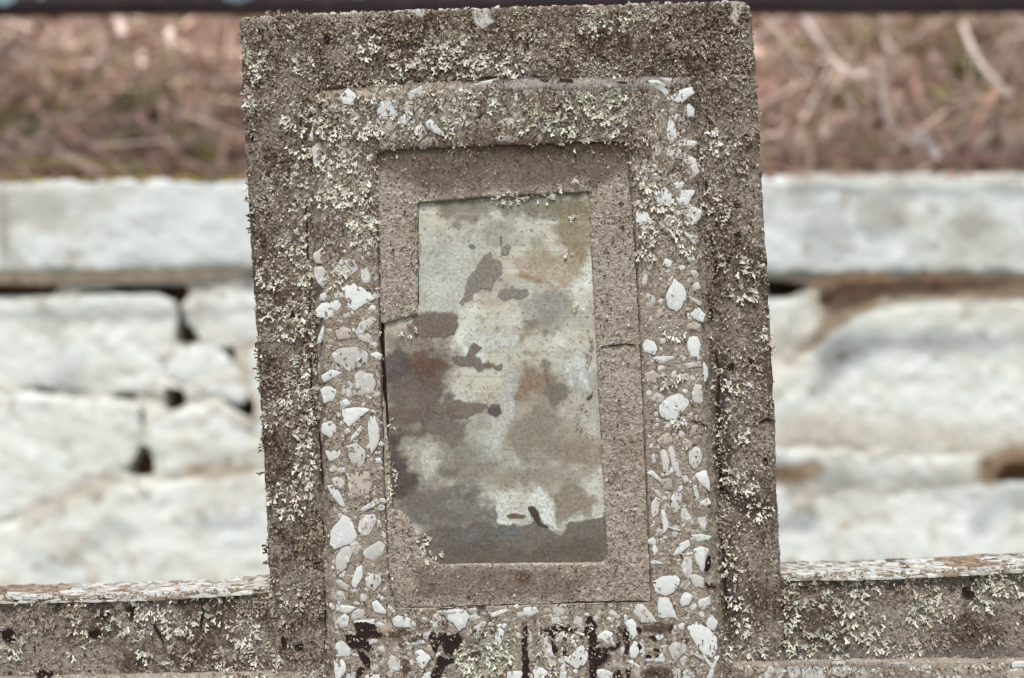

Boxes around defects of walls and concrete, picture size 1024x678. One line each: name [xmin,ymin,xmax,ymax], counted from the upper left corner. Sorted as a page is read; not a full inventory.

leakage [373,134,631,325]
leakage [386,332,605,534]